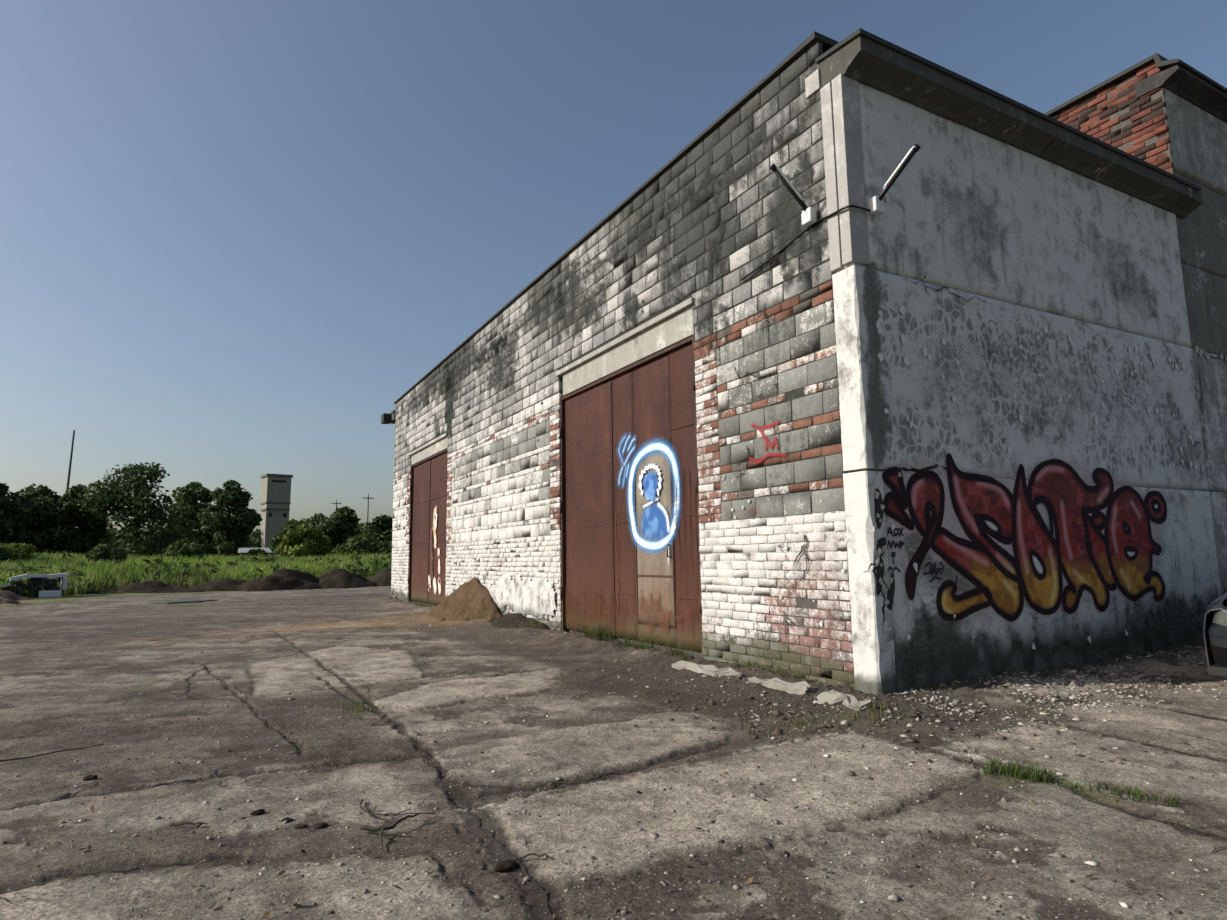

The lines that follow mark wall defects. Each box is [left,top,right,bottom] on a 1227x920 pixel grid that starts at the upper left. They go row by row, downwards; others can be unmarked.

mould [399,107,828,437]
peeling [863,262,891,473]
peeling [923,324,1197,469]
peeling [873,488,975,618]
leakage [890,540,1226,687]
crack [0,632,717,920]